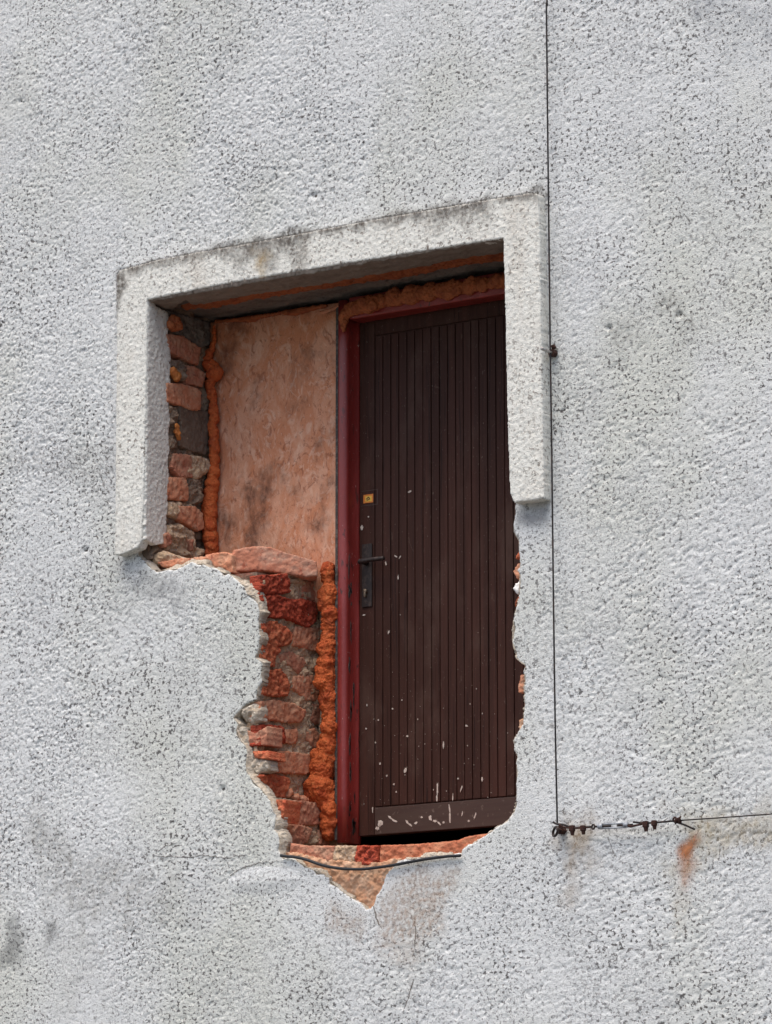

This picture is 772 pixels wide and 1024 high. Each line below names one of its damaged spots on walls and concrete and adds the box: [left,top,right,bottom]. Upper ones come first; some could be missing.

spalling [139,304,517,909]
spalling [512,534,526,777]
corrosion [679,837,696,857]